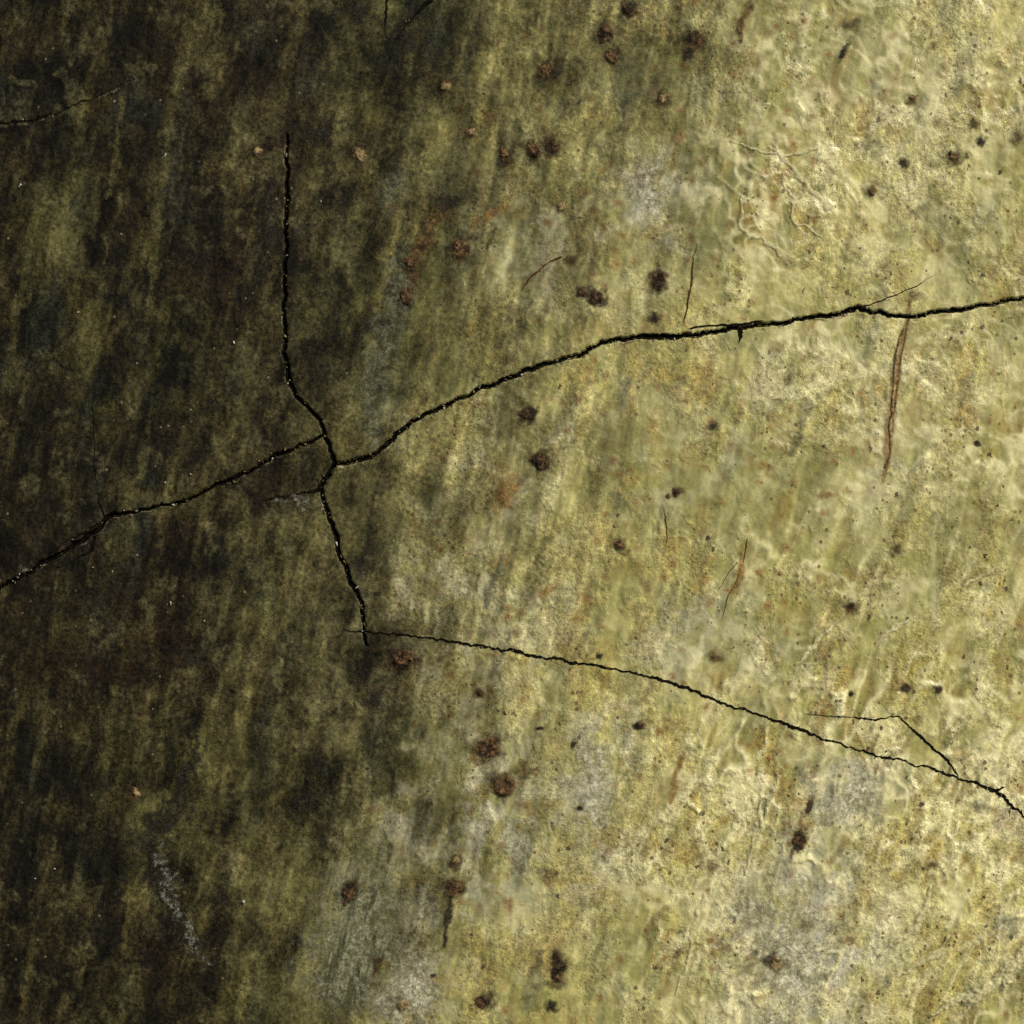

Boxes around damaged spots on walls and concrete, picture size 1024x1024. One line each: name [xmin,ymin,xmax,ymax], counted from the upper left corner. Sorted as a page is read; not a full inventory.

rust [520,128,561,166]
rust [883,291,918,482]
leakage [0,0,591,1024]
crack [0,135,1024,818]
rust [529,450,550,470]
rust [475,737,501,763]
rust [490,764,535,798]
rust [443,855,466,948]